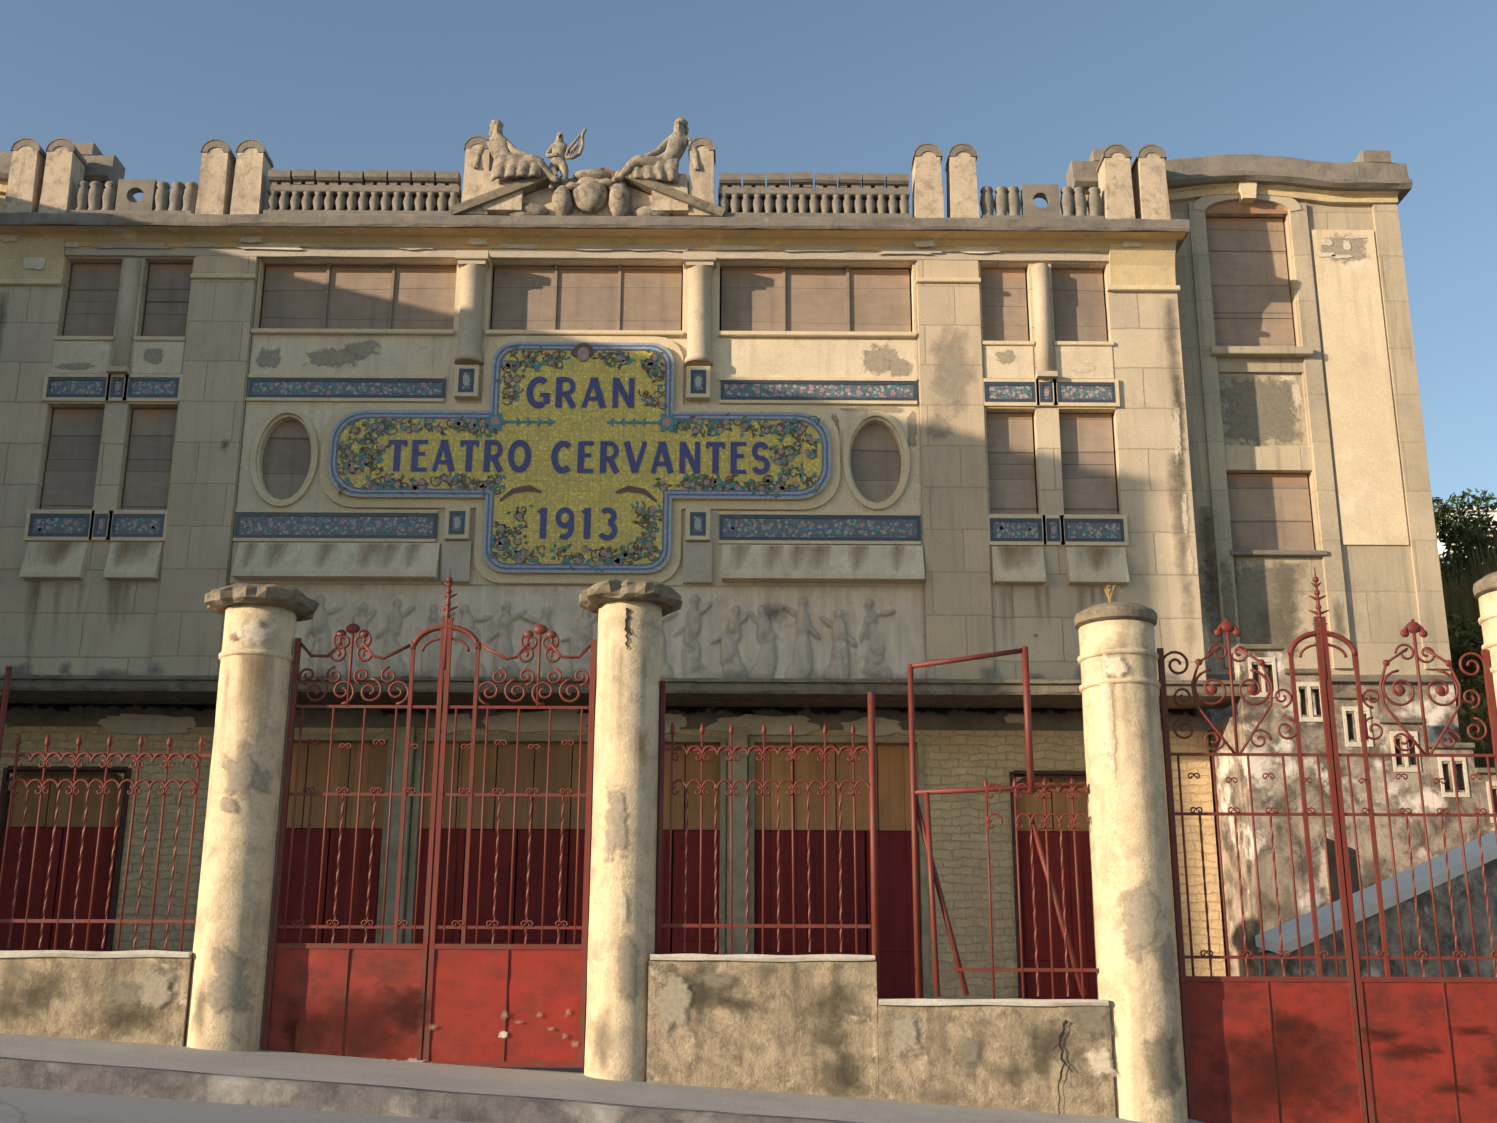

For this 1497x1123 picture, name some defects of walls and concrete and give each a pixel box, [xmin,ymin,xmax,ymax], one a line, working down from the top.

peeling [1315,234,1367,264]
spalling [256,348,280,368]
spalling [308,340,378,367]
leakage [1167,305,1181,429]
peeling [1220,375,1303,446]
leakage [1171,458,1184,554]
leakage [1203,517,1300,651]
spalling [219,740,271,813]
peeling [604,787,627,863]
spalling [1118,881,1178,997]
crack [1053,1020,1073,1114]